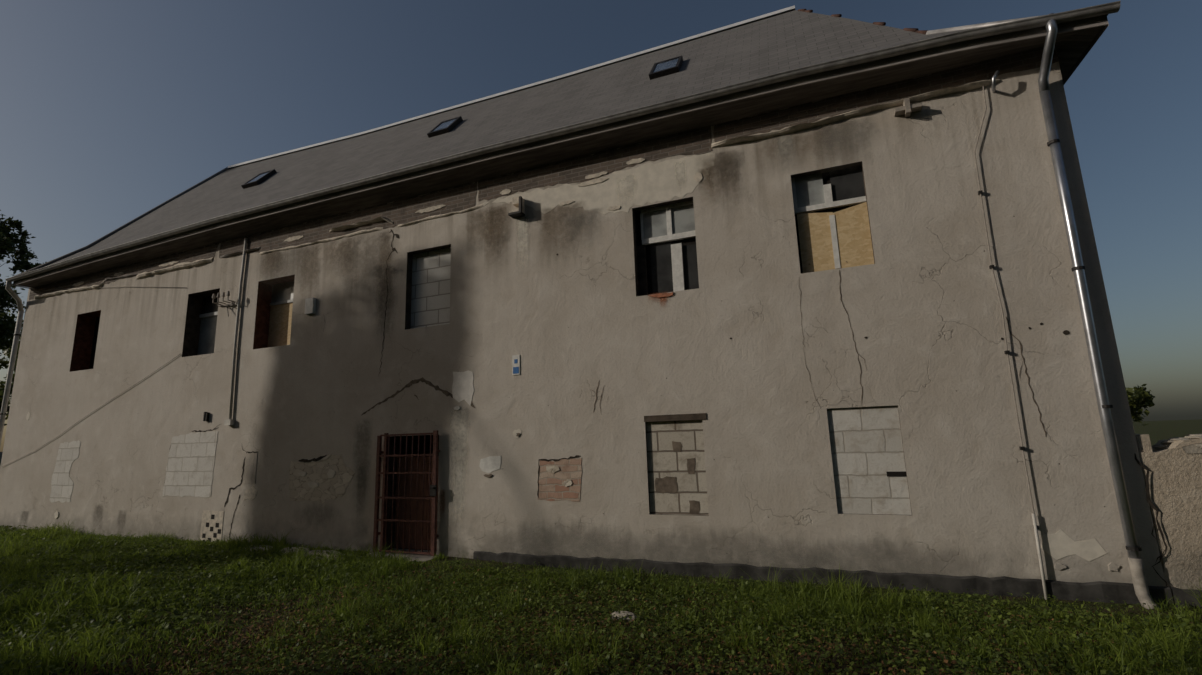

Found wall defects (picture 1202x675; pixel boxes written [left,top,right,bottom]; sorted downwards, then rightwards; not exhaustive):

flaking render [29,47,1060,300]
crack [362,230,475,415]
crack [839,270,867,405]
flaking render [537,458,582,502]
crack [1134,453,1170,587]